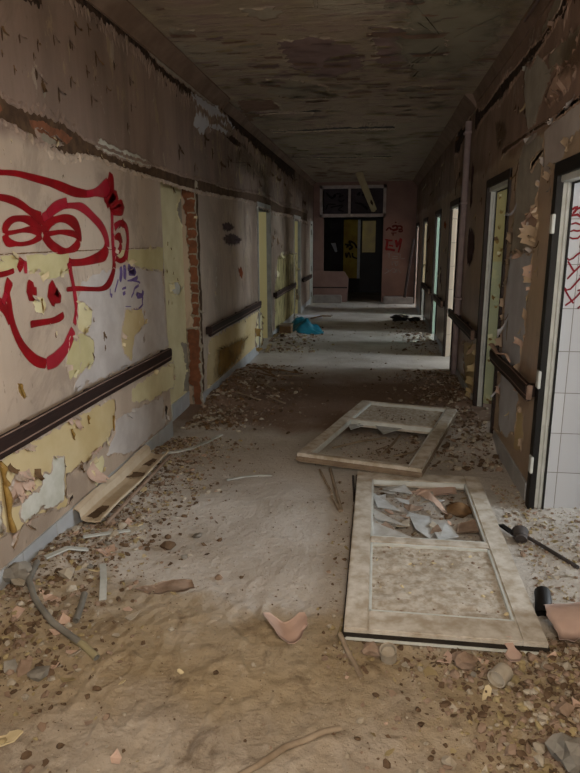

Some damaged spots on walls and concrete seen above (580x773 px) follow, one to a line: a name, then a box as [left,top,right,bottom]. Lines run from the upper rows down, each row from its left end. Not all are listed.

peeling [0,26,308,539]
peeling [253,35,366,84]
peeling [486,371,524,455]
peeling [488,54,580,373]